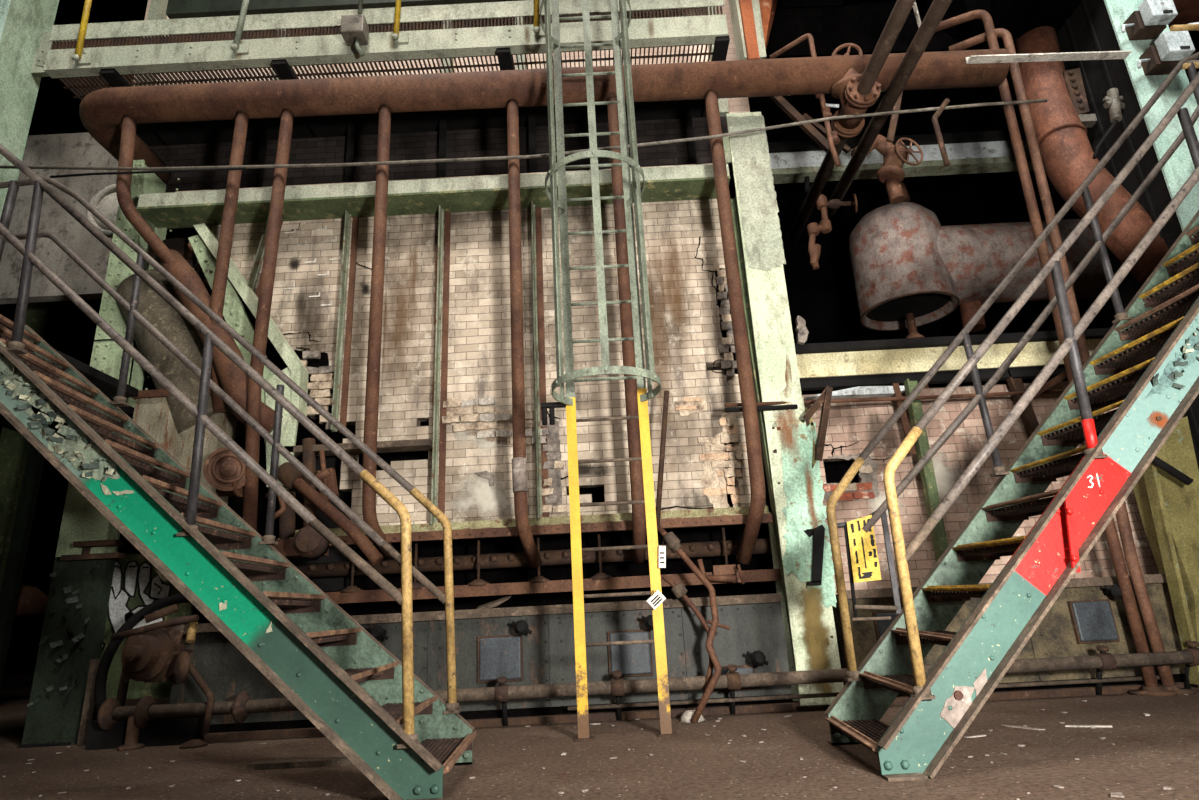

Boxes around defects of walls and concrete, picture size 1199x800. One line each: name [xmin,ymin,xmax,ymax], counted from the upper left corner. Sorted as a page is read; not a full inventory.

peeling [338,397,880,616]
spalling [197,600,227,624]
rust [800,586,831,692]